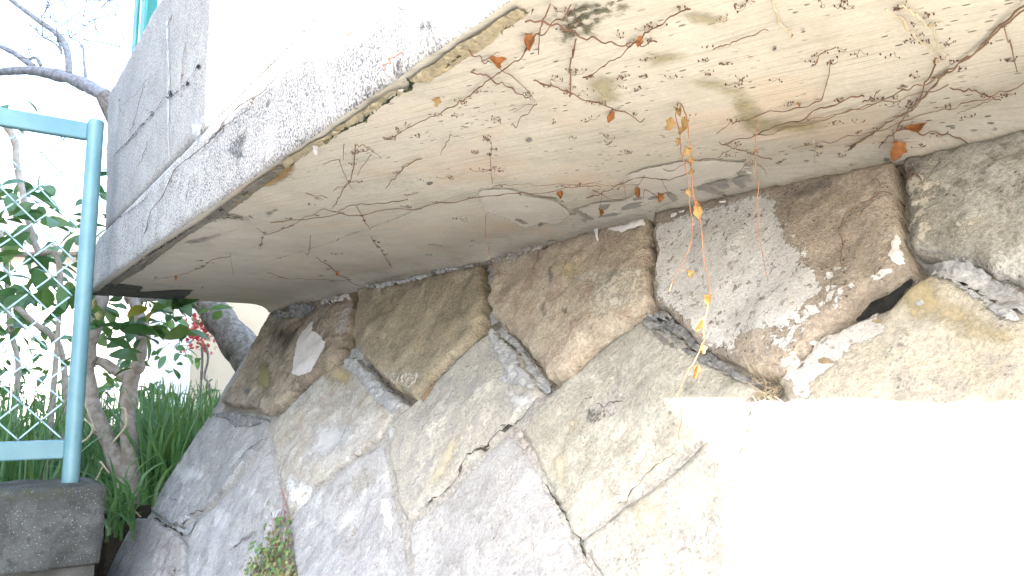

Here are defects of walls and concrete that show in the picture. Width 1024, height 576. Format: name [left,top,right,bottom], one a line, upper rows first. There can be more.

spalling [111,9,528,286]
peeling [477,160,914,398]
crack [424,397,539,507]
crack [608,453,674,505]